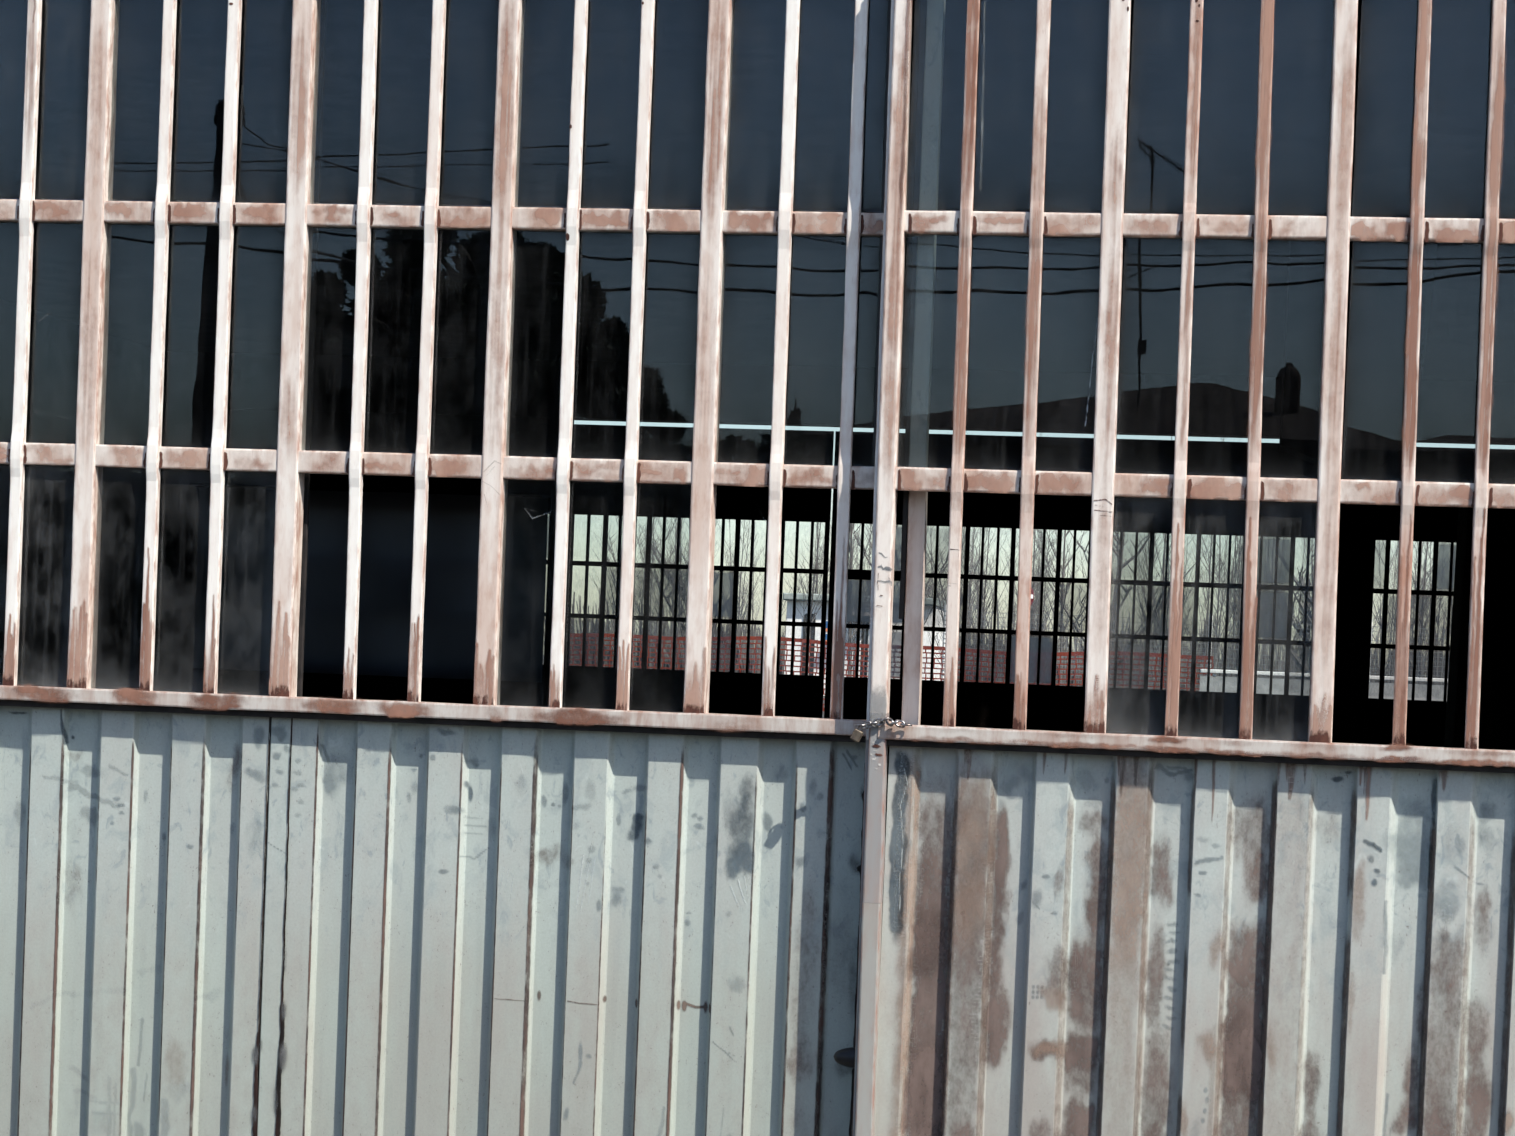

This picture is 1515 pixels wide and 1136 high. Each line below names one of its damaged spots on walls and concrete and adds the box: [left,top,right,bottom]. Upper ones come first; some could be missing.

rust [534,207,688,231]
rust [117,447,228,470]
rust [316,455,468,477]
rust [721,465,855,490]
rust [887,362,1081,494]
rust [1141,477,1294,502]
rust [830,568,844,719]
rust [893,658,1009,1136]
rust [1013,517,1259,1136]
rust [1205,697,1332,1136]
rust [1337,942,1350,1136]
rust [1395,827,1515,1136]